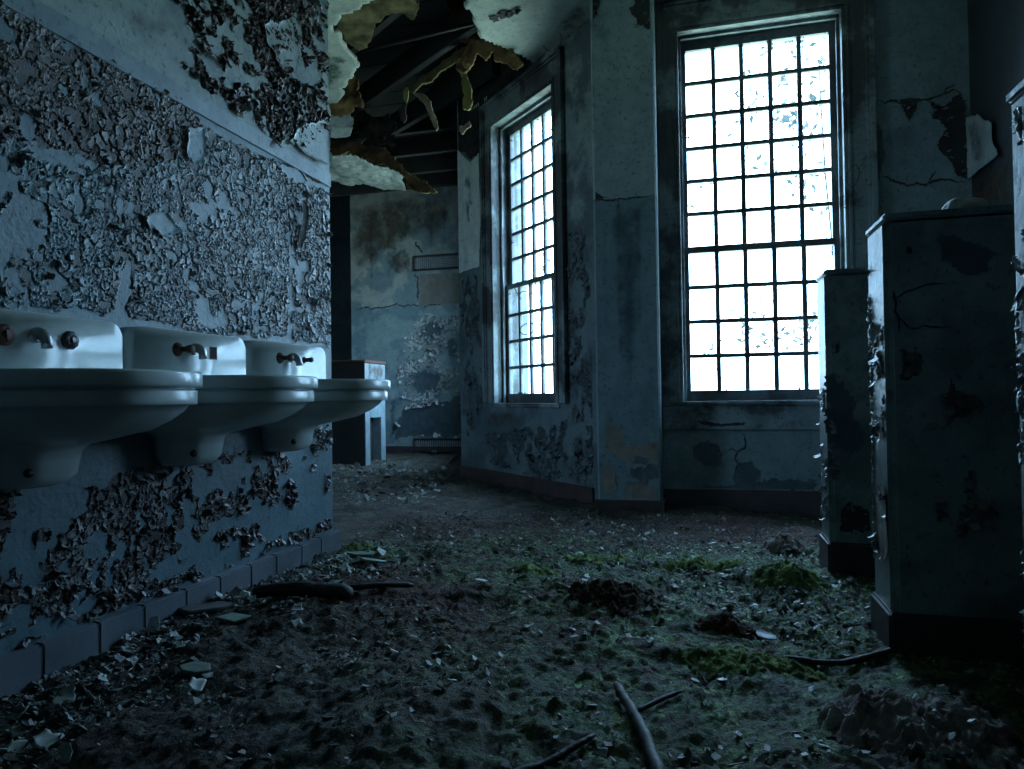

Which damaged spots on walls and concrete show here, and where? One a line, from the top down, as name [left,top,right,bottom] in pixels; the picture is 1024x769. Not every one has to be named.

peeling [489,8,522,23]
peeling [0,0,333,349]
crack [355,241,445,310]
water stain [356,199,446,272]
peeling [458,54,532,159]
crack [593,194,653,208]
crack [878,83,964,105]
crack [881,170,968,188]
peeling [899,93,970,180]
peeling [394,227,593,485]
peeling [701,293,888,561]
peeling [0,450,333,648]